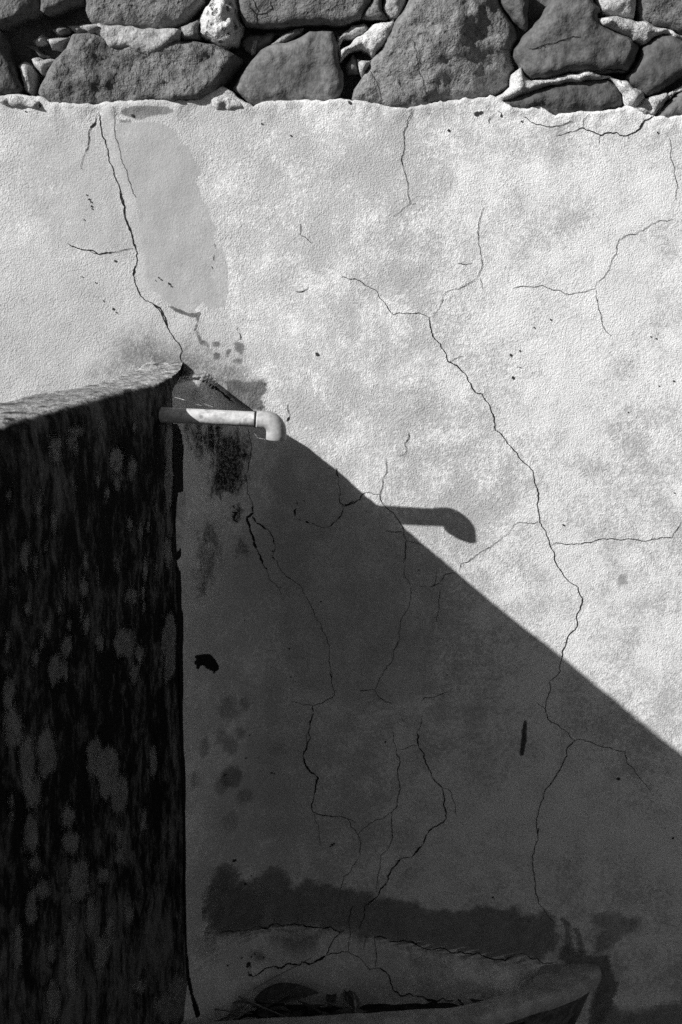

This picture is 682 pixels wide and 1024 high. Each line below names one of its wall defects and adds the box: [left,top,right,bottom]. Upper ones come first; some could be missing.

crack [394,41,428,216]
crack [488,93,672,140]
crack [67,108,233,402]
crack [513,141,678,336]
crack [173,424,184,514]
damp [185,424,249,521]
crack [221,208,682,1002]
crack [177,548,186,886]
crack [187,955,200,1018]
damp [204,865,682,1024]